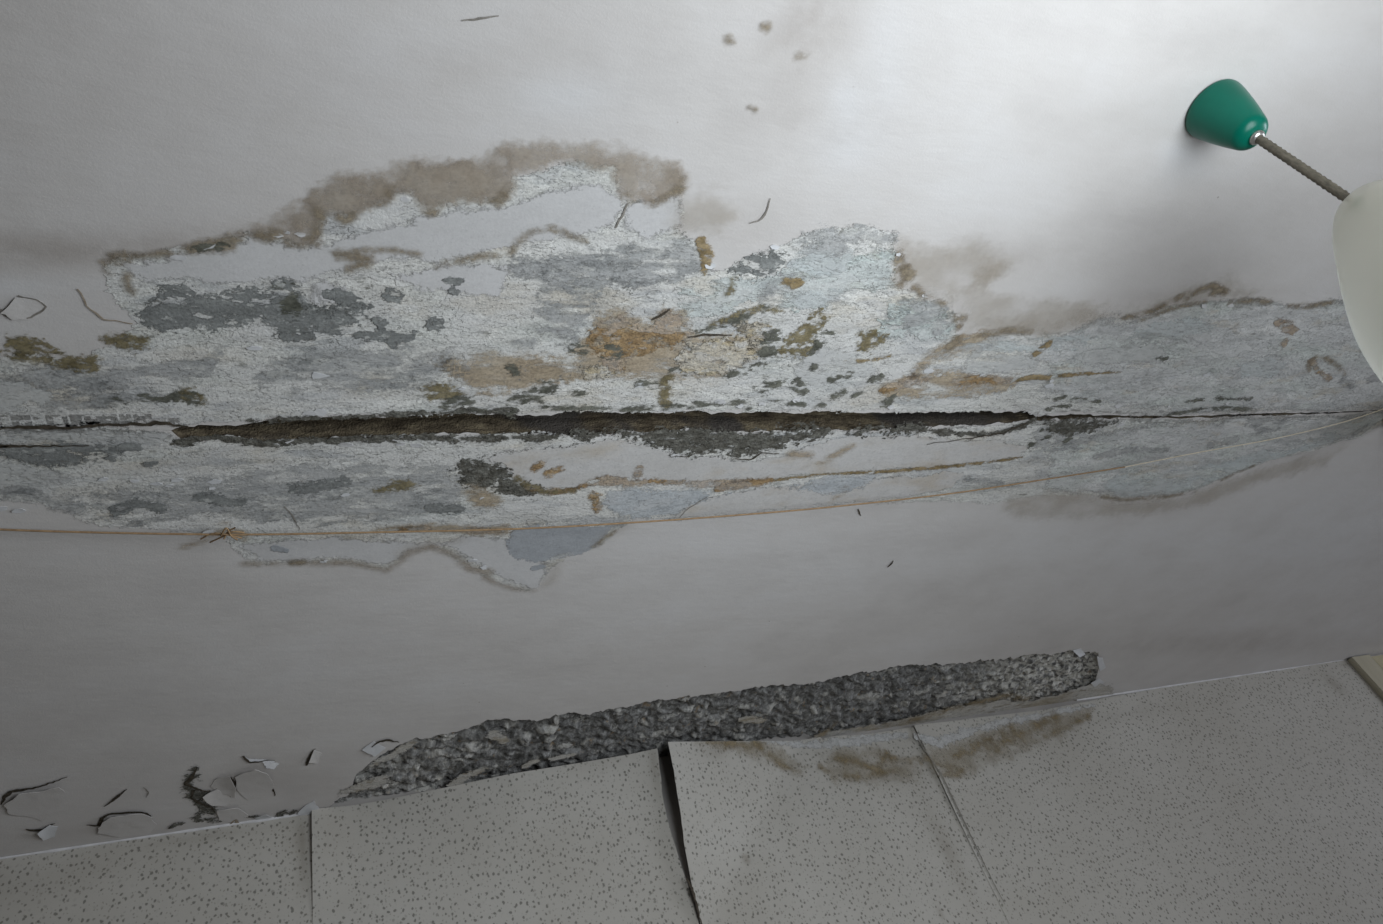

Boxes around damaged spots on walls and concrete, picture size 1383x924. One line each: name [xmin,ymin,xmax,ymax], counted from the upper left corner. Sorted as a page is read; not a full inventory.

water stain [103,146,684,293]
crack [0,383,1377,460]
peeling [0,159,1383,592]
flaking render [0,777,67,841]
spalling [89,756,298,837]
spalling [328,649,1114,808]